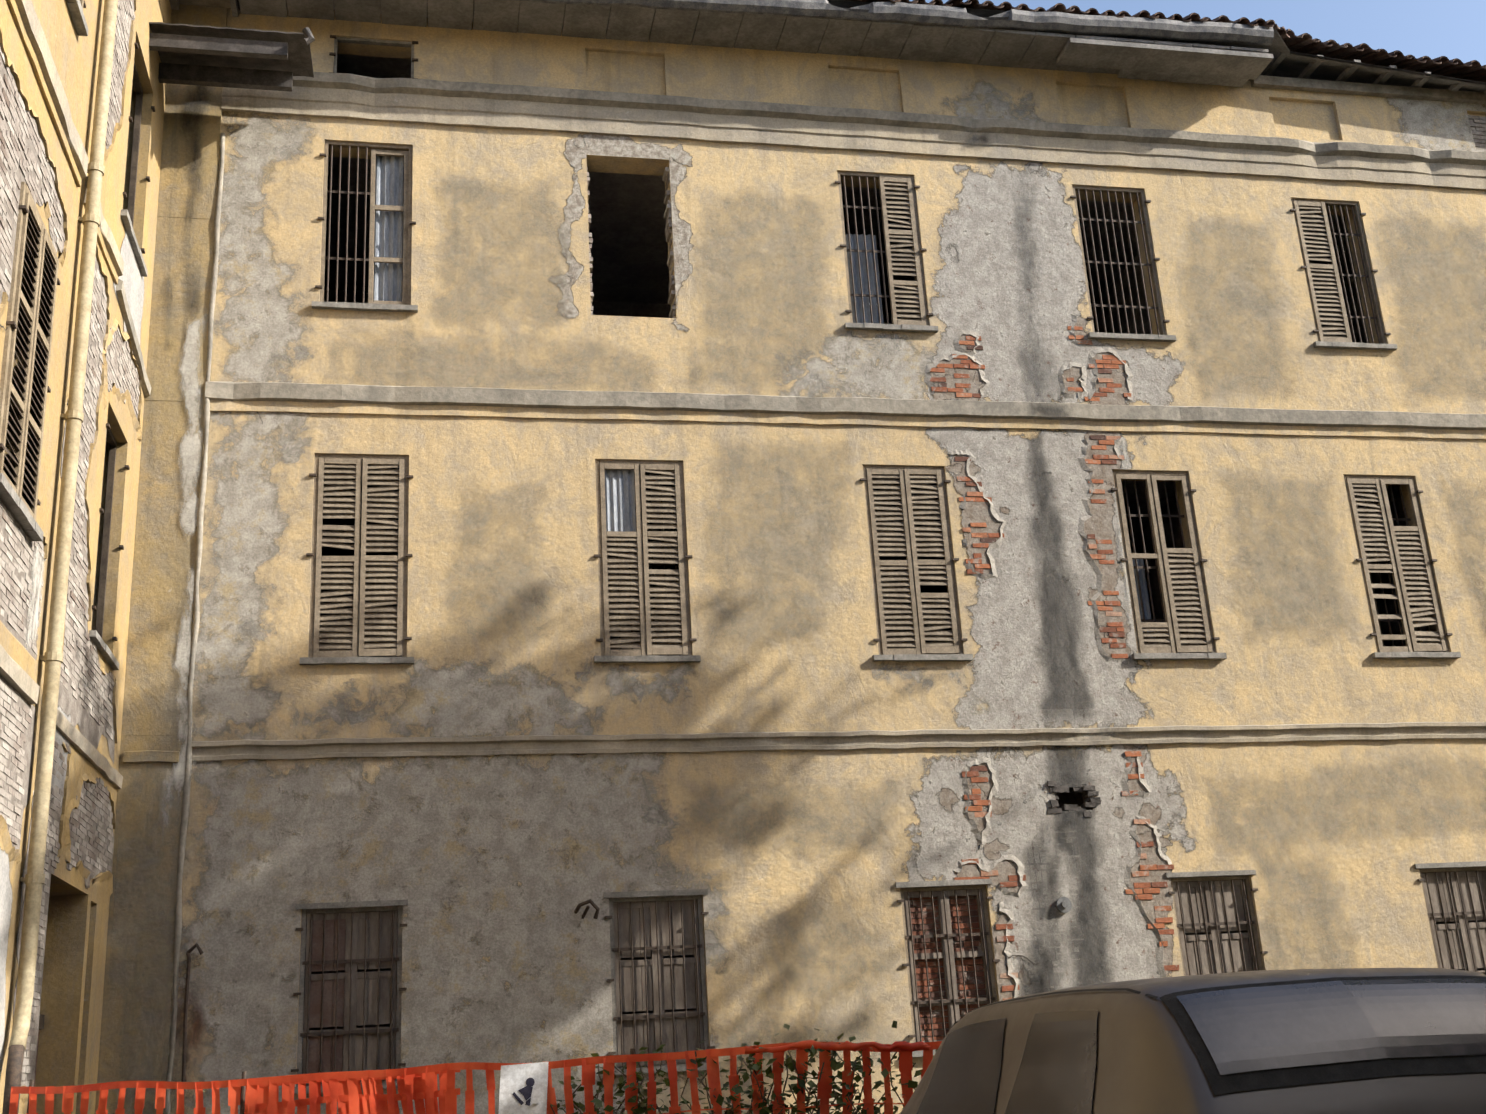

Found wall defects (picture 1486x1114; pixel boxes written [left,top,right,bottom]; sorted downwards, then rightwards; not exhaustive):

flaking render [0,30,68,318]
peeling [217,111,314,383]
spalling [548,134,694,332]
peeling [775,162,1186,406]
flaking render [0,245,142,1104]
peeling [192,411,694,740]
peeling [177,753,730,1114]
peeling [873,427,1199,1001]
damp [1032,438,1091,720]
damp [1024,810,1109,995]
damp [1051,746,1084,787]
damp [1122,562,1134,625]